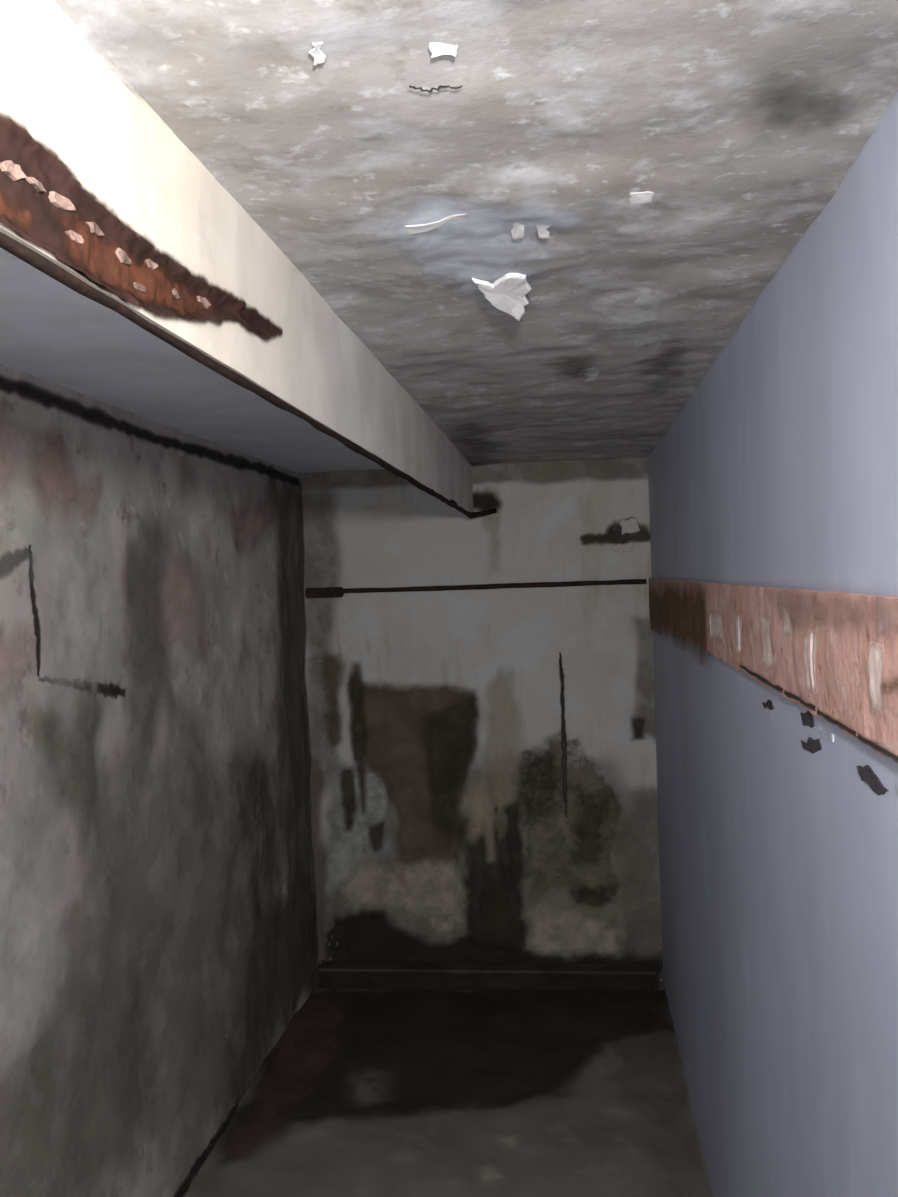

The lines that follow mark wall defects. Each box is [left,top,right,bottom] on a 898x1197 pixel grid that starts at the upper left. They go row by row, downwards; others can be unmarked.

crack [409,85,462,93]
peeling [379,199,579,321]
water stain [460,432,648,494]
spalling [581,518,650,552]
crack [0,545,126,697]
spalling [649,578,898,763]
water stain [0,469,673,1197]
crack [559,652,567,817]
peeling [857,765,898,795]